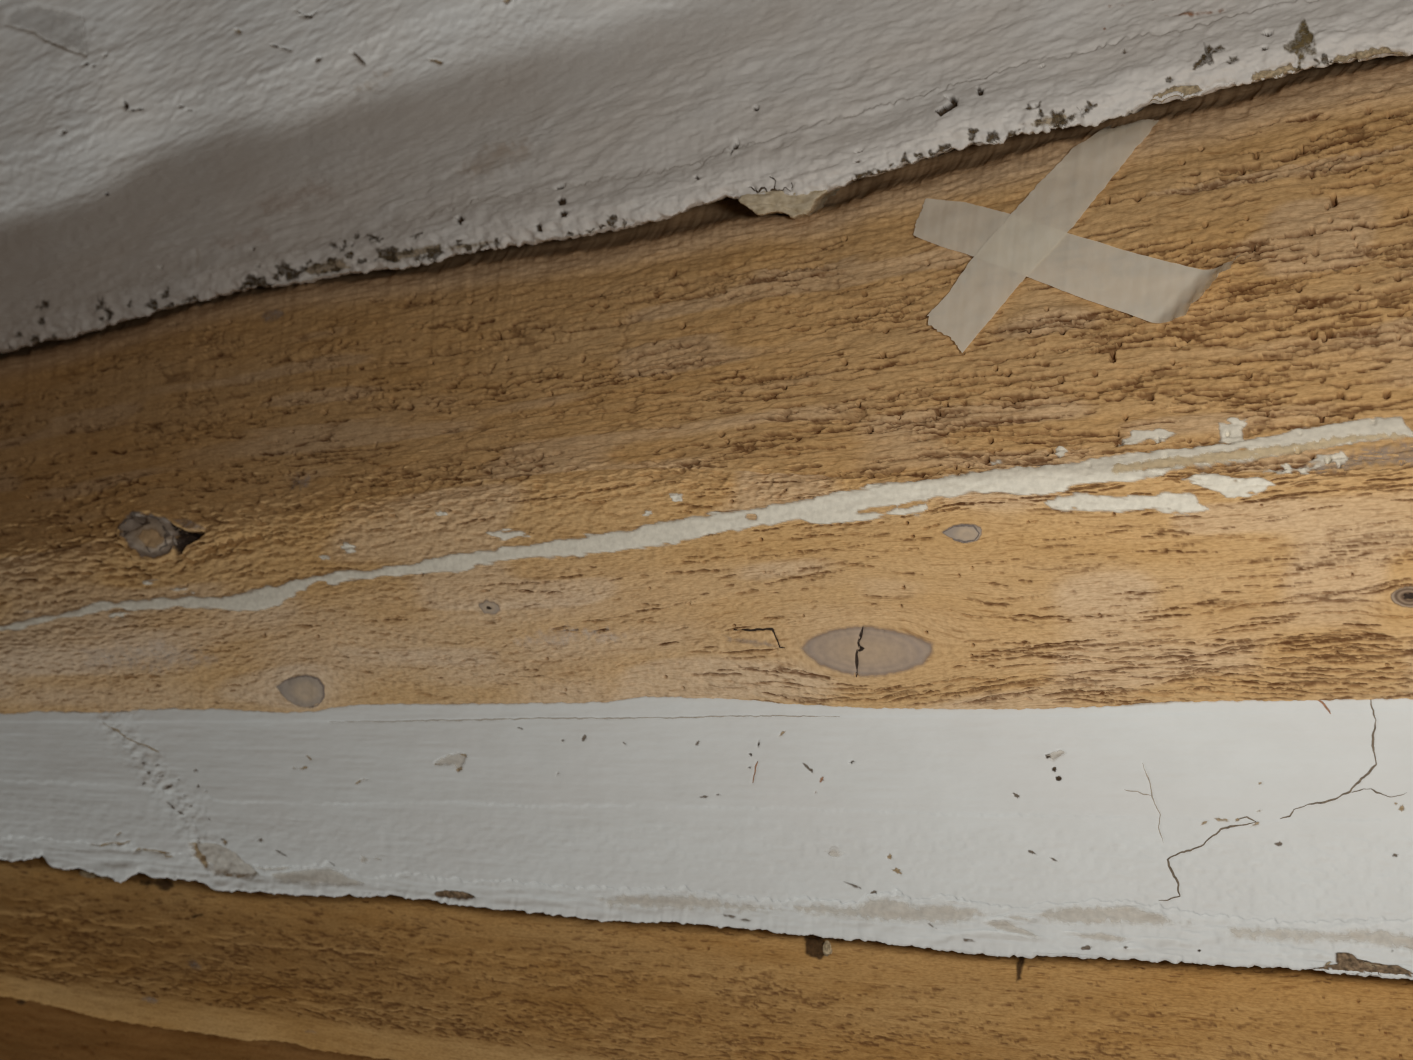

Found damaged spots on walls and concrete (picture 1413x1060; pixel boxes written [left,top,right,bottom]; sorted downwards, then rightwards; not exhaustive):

spalling [738,188,840,219]
peeling [1119,429,1175,446]
peeling [1219,417,1247,444]
peeling [1045,452,1348,513]
peeling [486,529,530,541]
peeling [319,542,356,560]
crack [1126,700,1404,901]